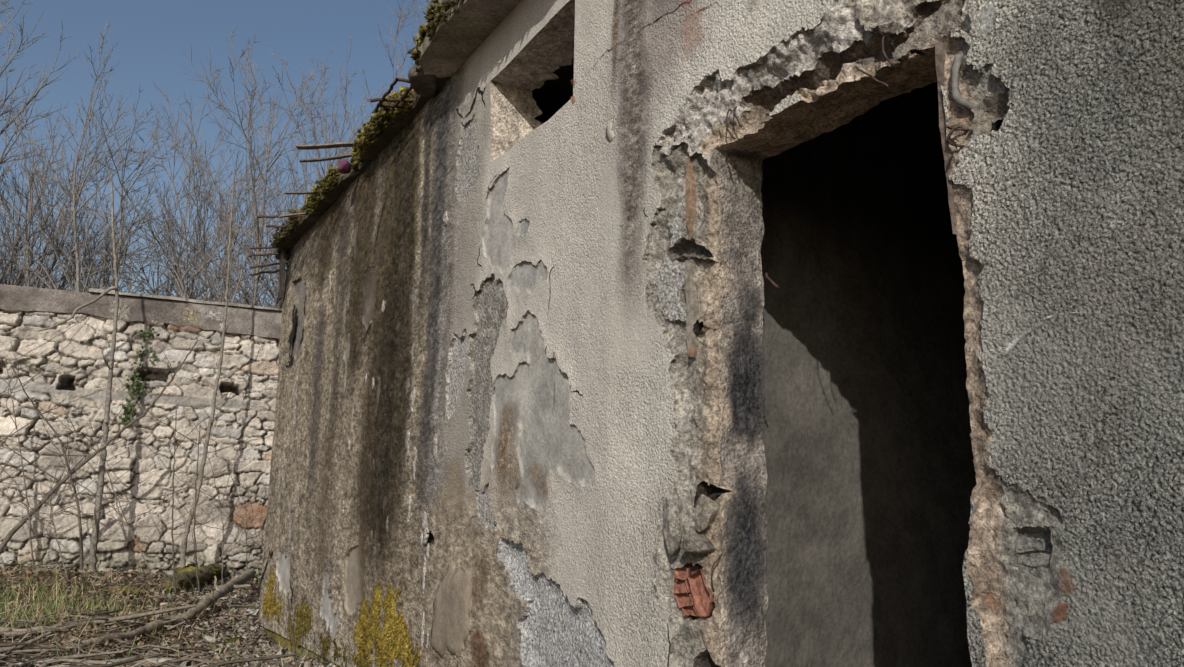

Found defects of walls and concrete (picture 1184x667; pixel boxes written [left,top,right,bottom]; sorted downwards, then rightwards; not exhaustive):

crack [583,0,711,76]
water stain [612,0,646,272]
peeling [427,211,449,240]
peeling [337,334,358,393]
water stain [310,104,448,571]
peeling [404,342,416,413]
peeling [432,113,614,667]
spalling [642,0,1066,667]
peeling [404,430,418,481]
peeling [406,495,434,594]
peeling [420,611,429,649]